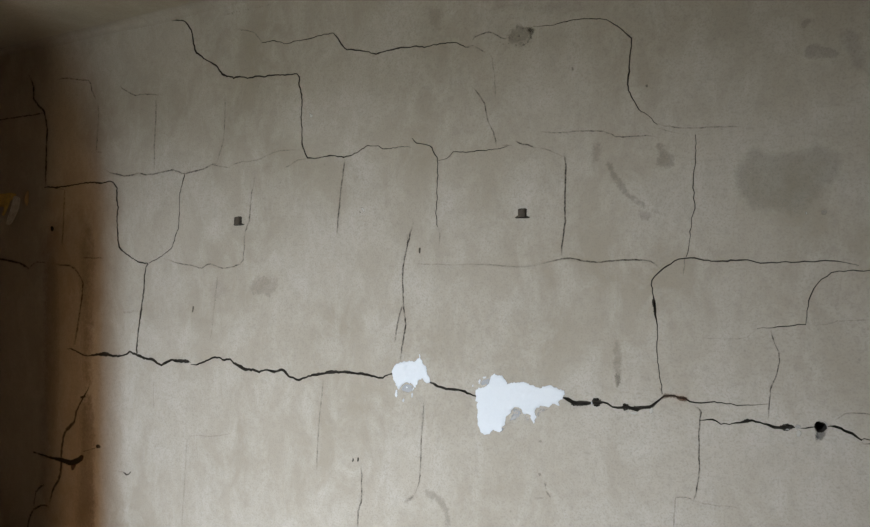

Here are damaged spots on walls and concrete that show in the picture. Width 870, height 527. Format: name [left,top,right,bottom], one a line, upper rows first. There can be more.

crack [173,20,533,228]
crack [27,390,88,527]
crack [0,81,392,381]
crack [396,233,411,349]
crack [429,381,476,397]
crack [537,18,870,491]